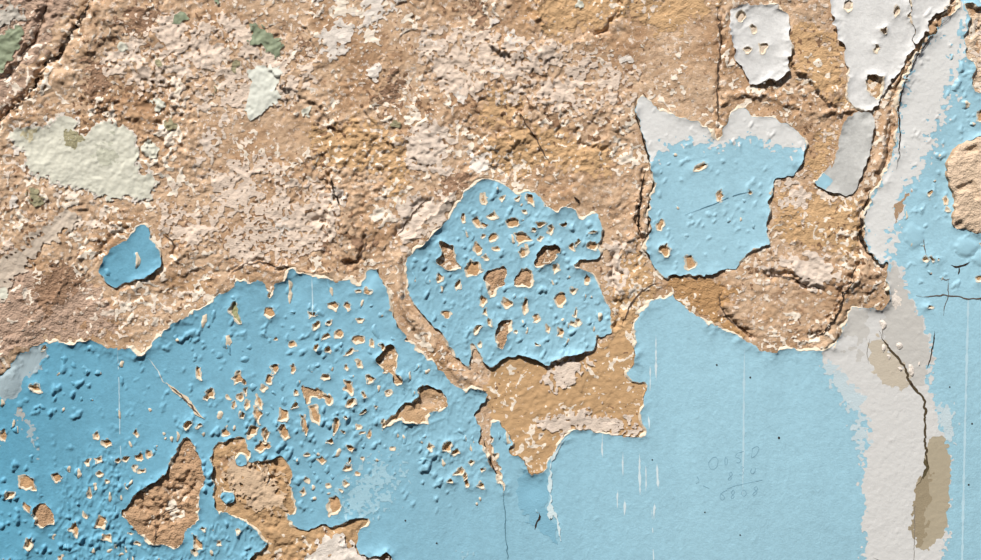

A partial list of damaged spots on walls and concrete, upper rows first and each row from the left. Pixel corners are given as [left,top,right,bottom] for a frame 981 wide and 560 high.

crack [0,0,93,121]
spalling [72,22,201,135]
spalling [964,2,981,93]
spalling [0,166,67,242]
peeling [60,210,251,316]
spalling [265,80,353,198]
peeling [494,0,951,338]
spalling [120,286,448,560]
peeling [401,175,646,545]
crack [867,262,981,554]
spalling [4,474,54,528]
peeling [67,511,117,548]